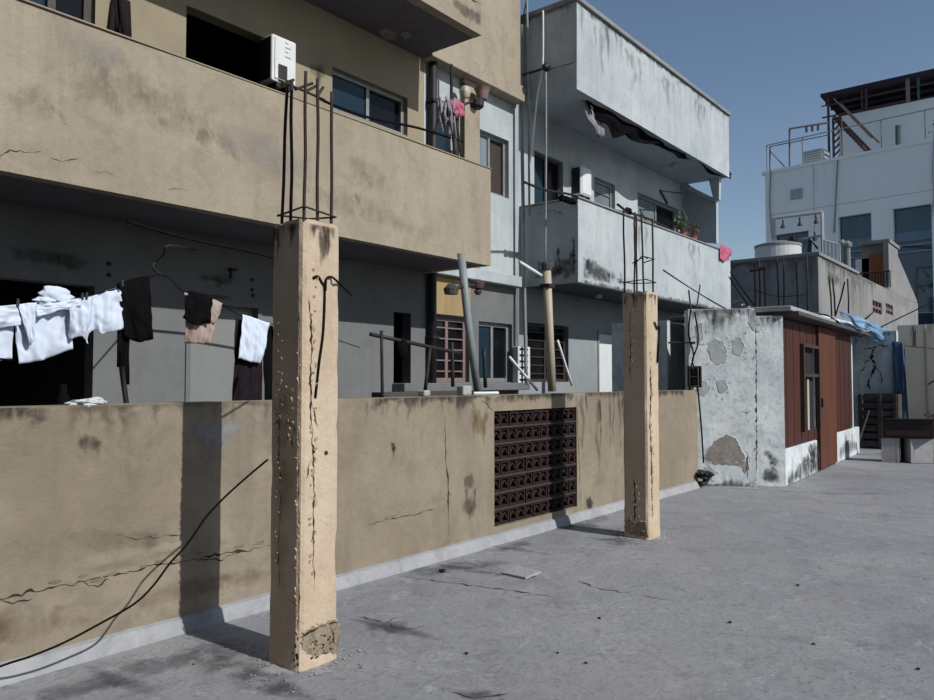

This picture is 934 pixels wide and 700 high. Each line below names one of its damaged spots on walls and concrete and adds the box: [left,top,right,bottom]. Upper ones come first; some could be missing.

water stain [537,239,741,315]
spalling [776,255,809,311]
peeling [690,260,766,365]
peeling [692,378,731,400]
crack [861,344,888,389]
crack [0,268,337,647]
crack [367,414,450,526]
spalling [702,435,750,481]
mould [764,451,777,481]
mould [788,443,820,484]
spalling [292,618,340,666]